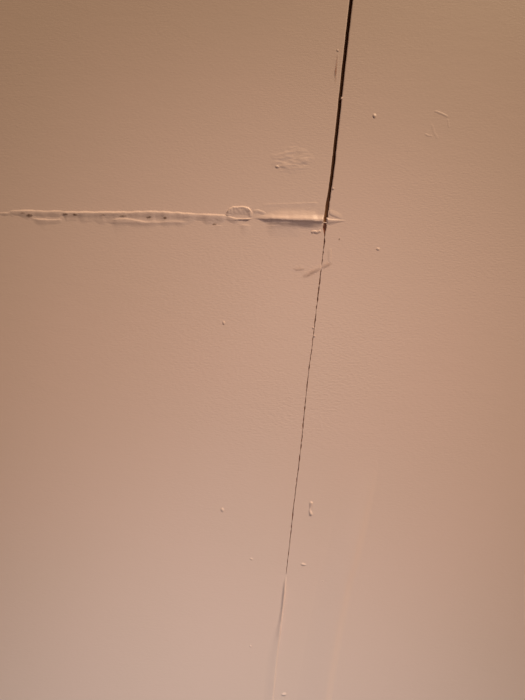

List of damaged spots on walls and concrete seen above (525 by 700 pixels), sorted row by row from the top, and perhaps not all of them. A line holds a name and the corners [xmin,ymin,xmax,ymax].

crack [264,0,353,700]